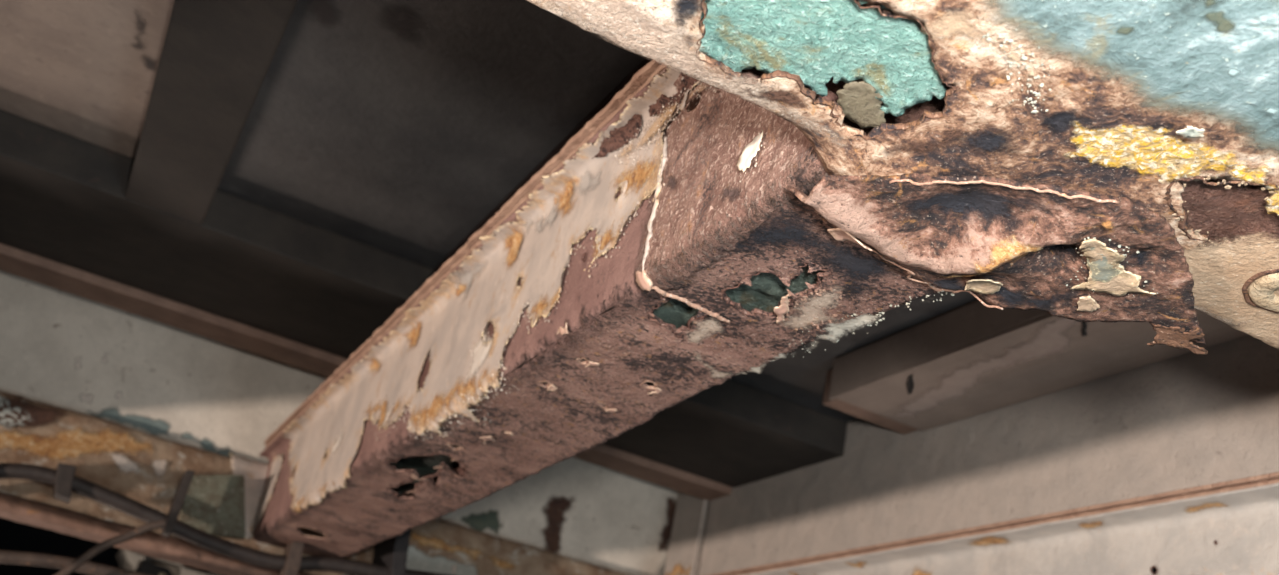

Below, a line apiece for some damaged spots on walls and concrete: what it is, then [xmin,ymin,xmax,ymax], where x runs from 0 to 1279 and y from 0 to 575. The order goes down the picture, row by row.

rust [592,71,697,159]
rust [747,89,806,106]
rust [886,128,1015,154]
peeling [1176,126,1205,139]
rust [616,160,676,196]
rust [906,190,1076,290]
peeling [251,66,717,535]
peeling [774,262,822,324]
peeling [1066,237,1158,312]
rust [0,397,152,460]
rust [543,496,574,553]
rust [659,498,677,550]